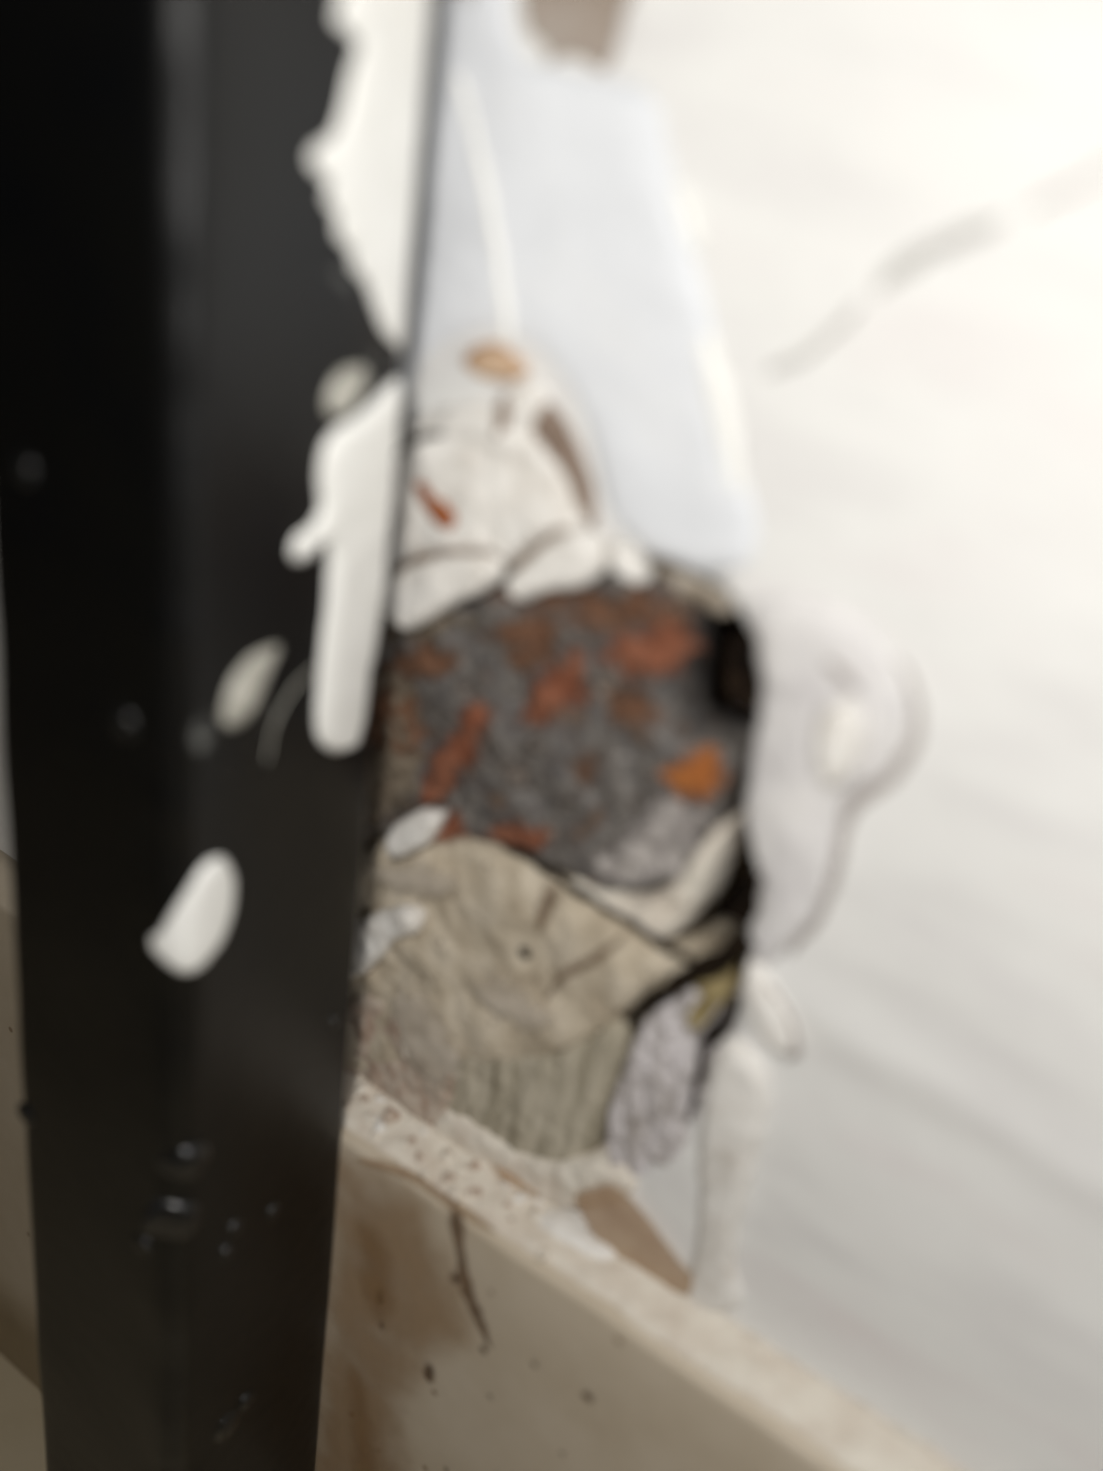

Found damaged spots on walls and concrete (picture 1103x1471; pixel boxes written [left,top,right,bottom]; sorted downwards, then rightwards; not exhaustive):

peeling [382,342,763,711]
rust [538,590,603,610]
rust [599,619,702,680]
rust [420,700,489,841]
rust [660,746,725,801]
rust [491,822,548,850]
hole [345,804,762,1208]